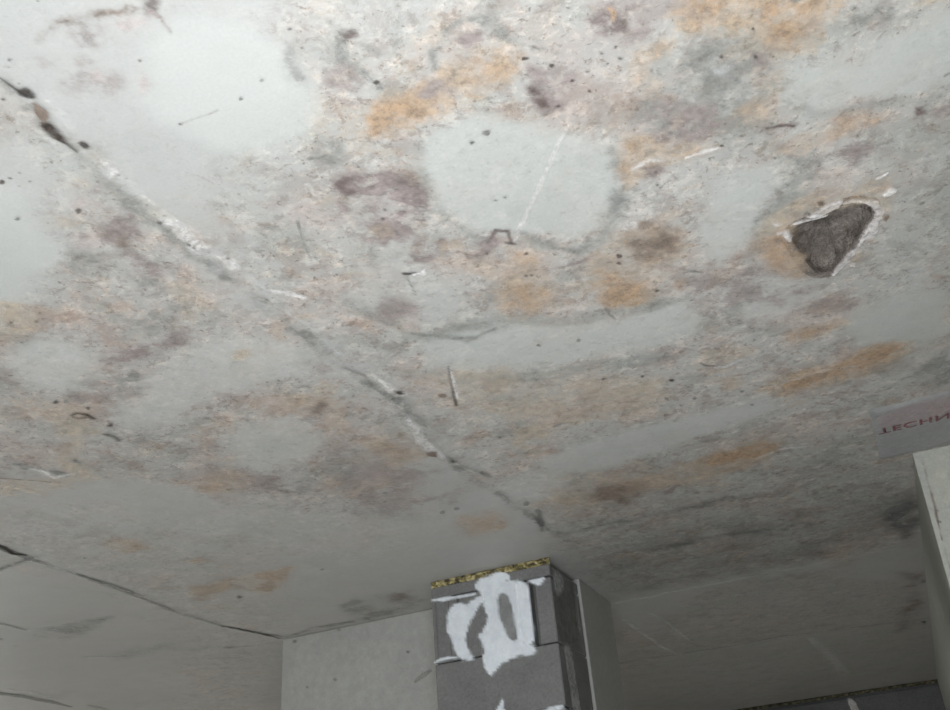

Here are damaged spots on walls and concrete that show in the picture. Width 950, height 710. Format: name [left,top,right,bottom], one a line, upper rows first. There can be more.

crack [0,78,89,151]
crack [116,189,232,281]
leakage [333,171,428,245]
leakage [466,229,513,258]
spalling [775,190,896,278]
crack [289,328,314,346]
crack [363,380,544,525]
crack [0,545,47,571]
crack [70,572,281,639]
crack [0,692,68,706]